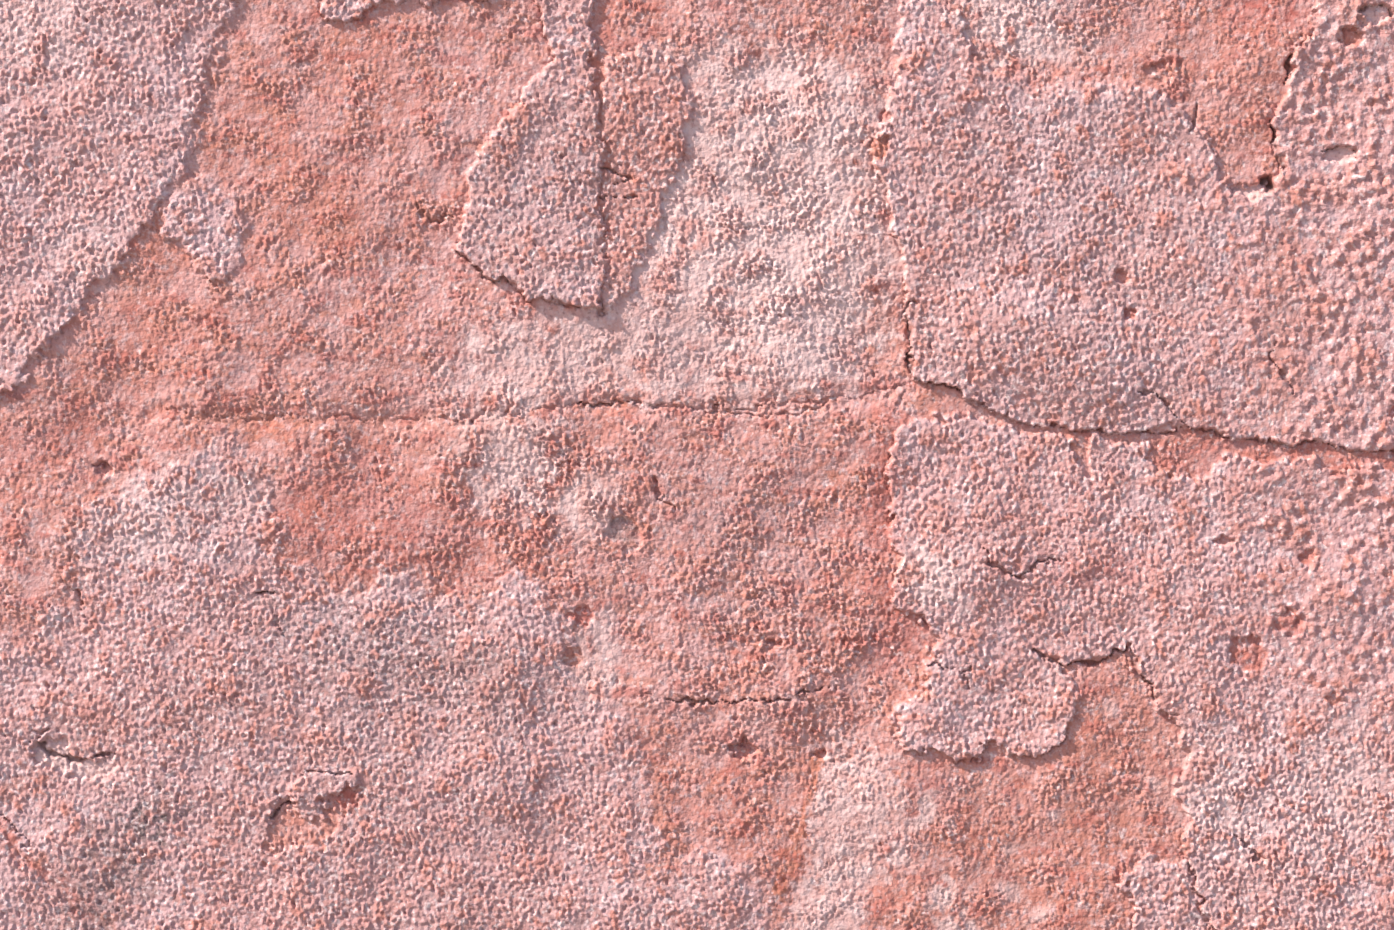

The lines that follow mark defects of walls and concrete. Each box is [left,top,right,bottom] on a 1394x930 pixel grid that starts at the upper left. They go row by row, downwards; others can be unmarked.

peeling [934,0,1394,203]
crack [1281,55,1298,86]
crack [1259,119,1289,195]
peeling [0,0,909,625]
crack [405,299,1394,458]
peeling [563,114,1230,930]
spalling [1225,606,1310,678]
crack [27,728,116,764]
spalling [30,735,123,791]
spalling [261,771,364,866]
crack [0,808,128,930]
crack [1180,844,1212,930]